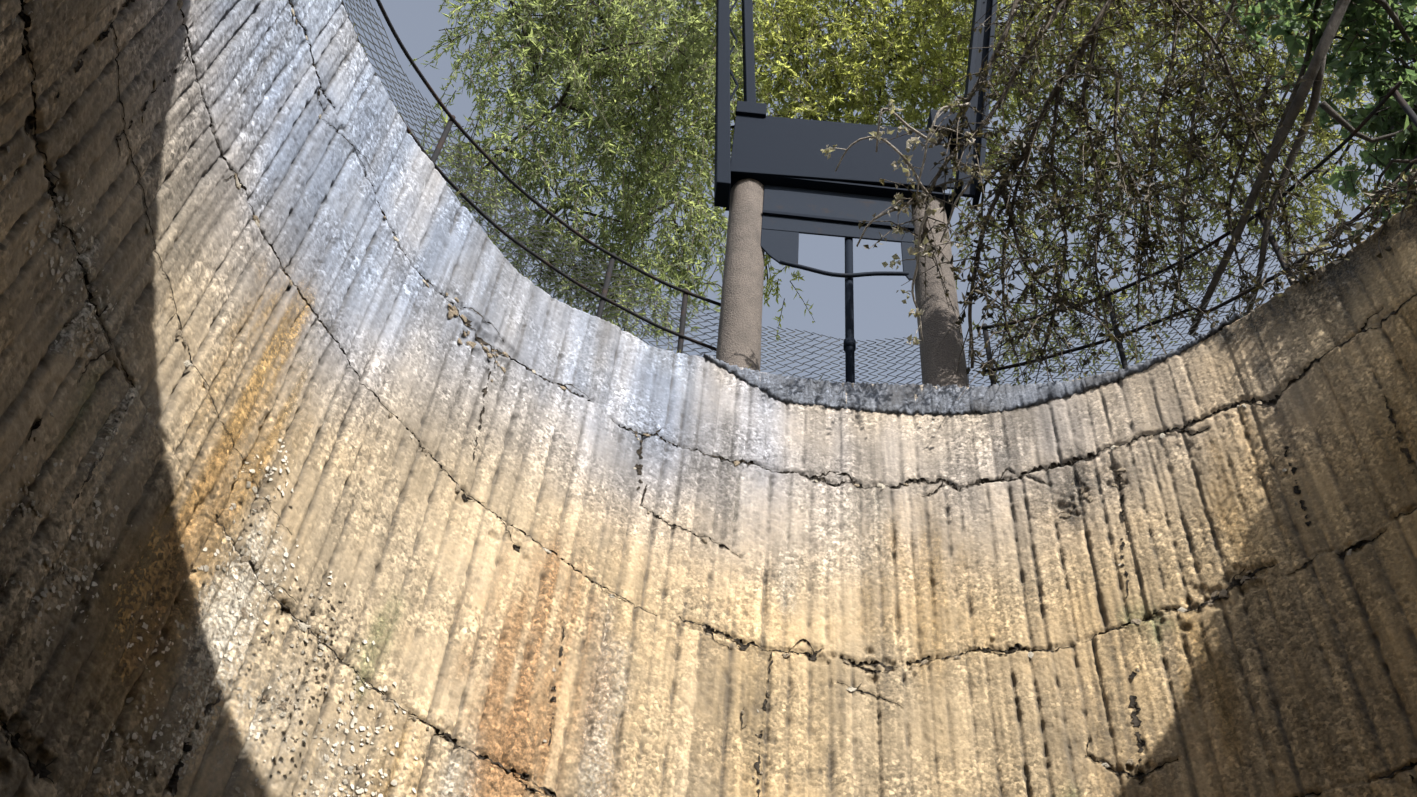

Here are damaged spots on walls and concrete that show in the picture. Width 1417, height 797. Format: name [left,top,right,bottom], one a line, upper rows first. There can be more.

crack [18,0,135,388]
crack [112,27,292,535]
rust [103,304,310,687]
crack [177,0,1417,708]
crack [0,719,54,785]
crack [216,514,557,797]
rust [464,546,567,797]
crack [1085,737,1178,784]
crack [1375,762,1417,779]